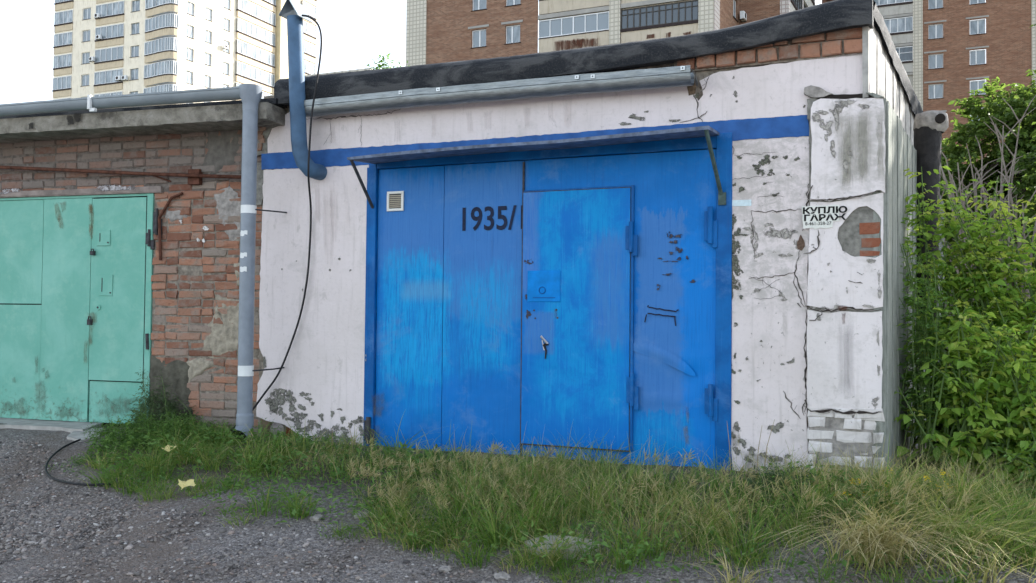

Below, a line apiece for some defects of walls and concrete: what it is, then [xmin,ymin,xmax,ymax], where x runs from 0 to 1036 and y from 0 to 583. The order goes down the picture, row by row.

flaking render [203,130,242,174]
peeling [737,154,800,197]
flaking render [165,210,189,224]
flaking render [196,186,241,243]
peeling [656,231,689,290]
peeling [732,214,805,299]
crack [732,145,882,418]
peeling [261,388,364,445]